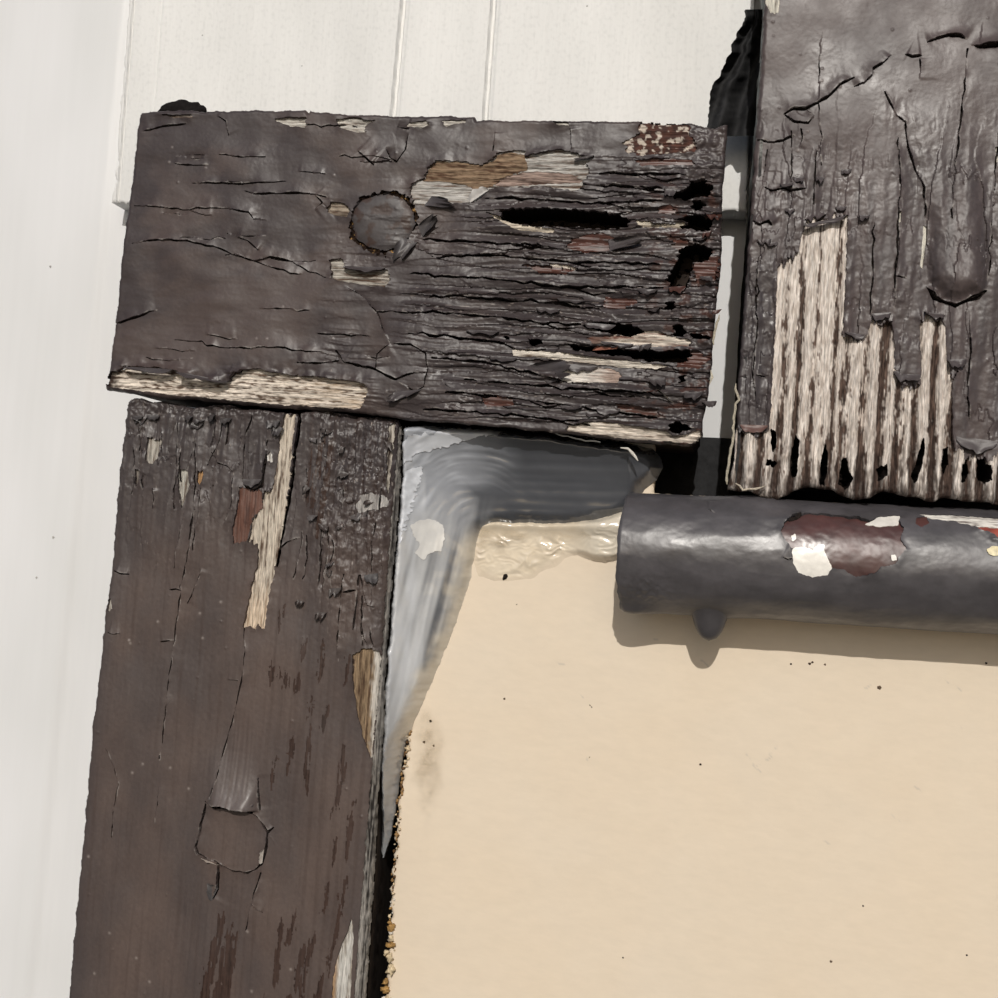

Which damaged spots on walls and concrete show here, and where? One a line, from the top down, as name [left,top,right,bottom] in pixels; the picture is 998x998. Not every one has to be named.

peeling [108,366,369,629]
crack [144,128,409,278]
crack [293,488,382,645]
crack [146,191,713,426]
peeling [410,150,594,208]
peeling [489,323,712,403]
peeling [560,403,702,444]
peeling [781,514,906,577]
peeling [727,206,998,505]
crack [757,33,998,224]
crack [869,92,926,313]
crack [927,236,992,308]